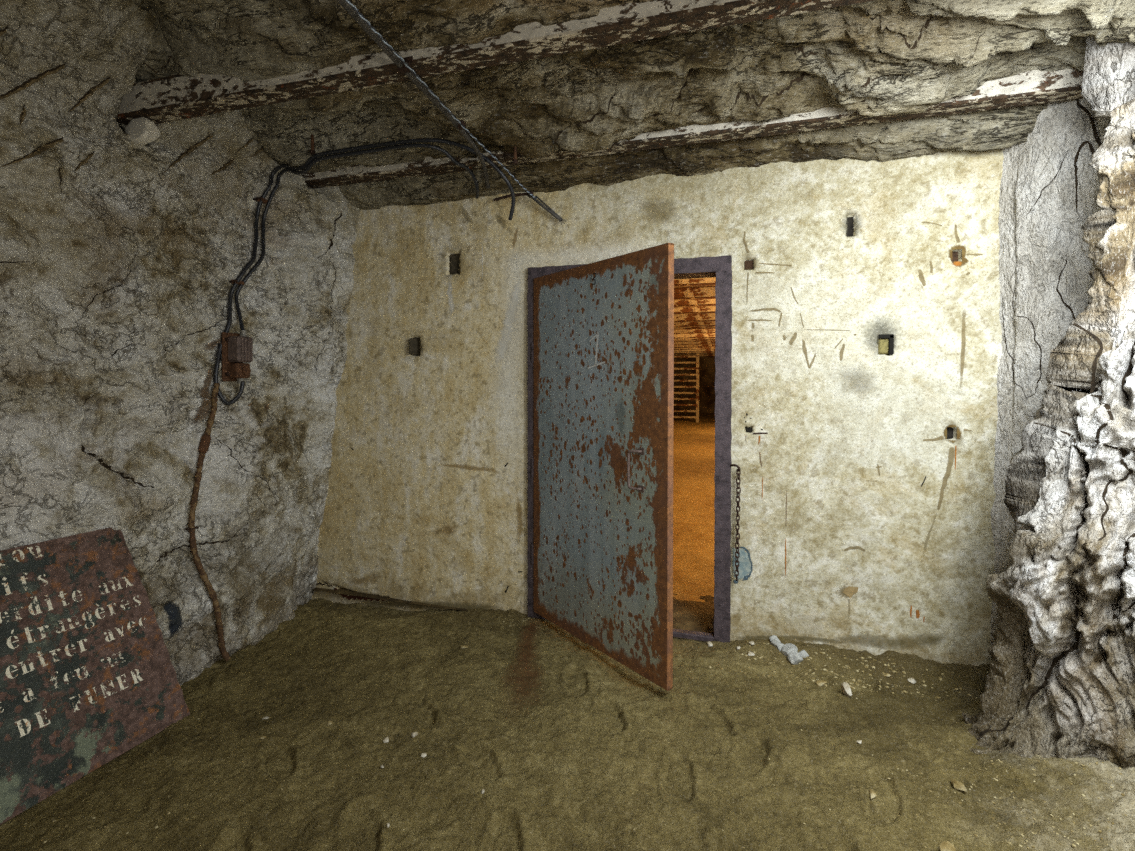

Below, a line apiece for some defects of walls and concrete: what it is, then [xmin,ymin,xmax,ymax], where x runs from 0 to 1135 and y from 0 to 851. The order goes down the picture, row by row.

crack [162,312,227,353]
crack [80,395,154,488]